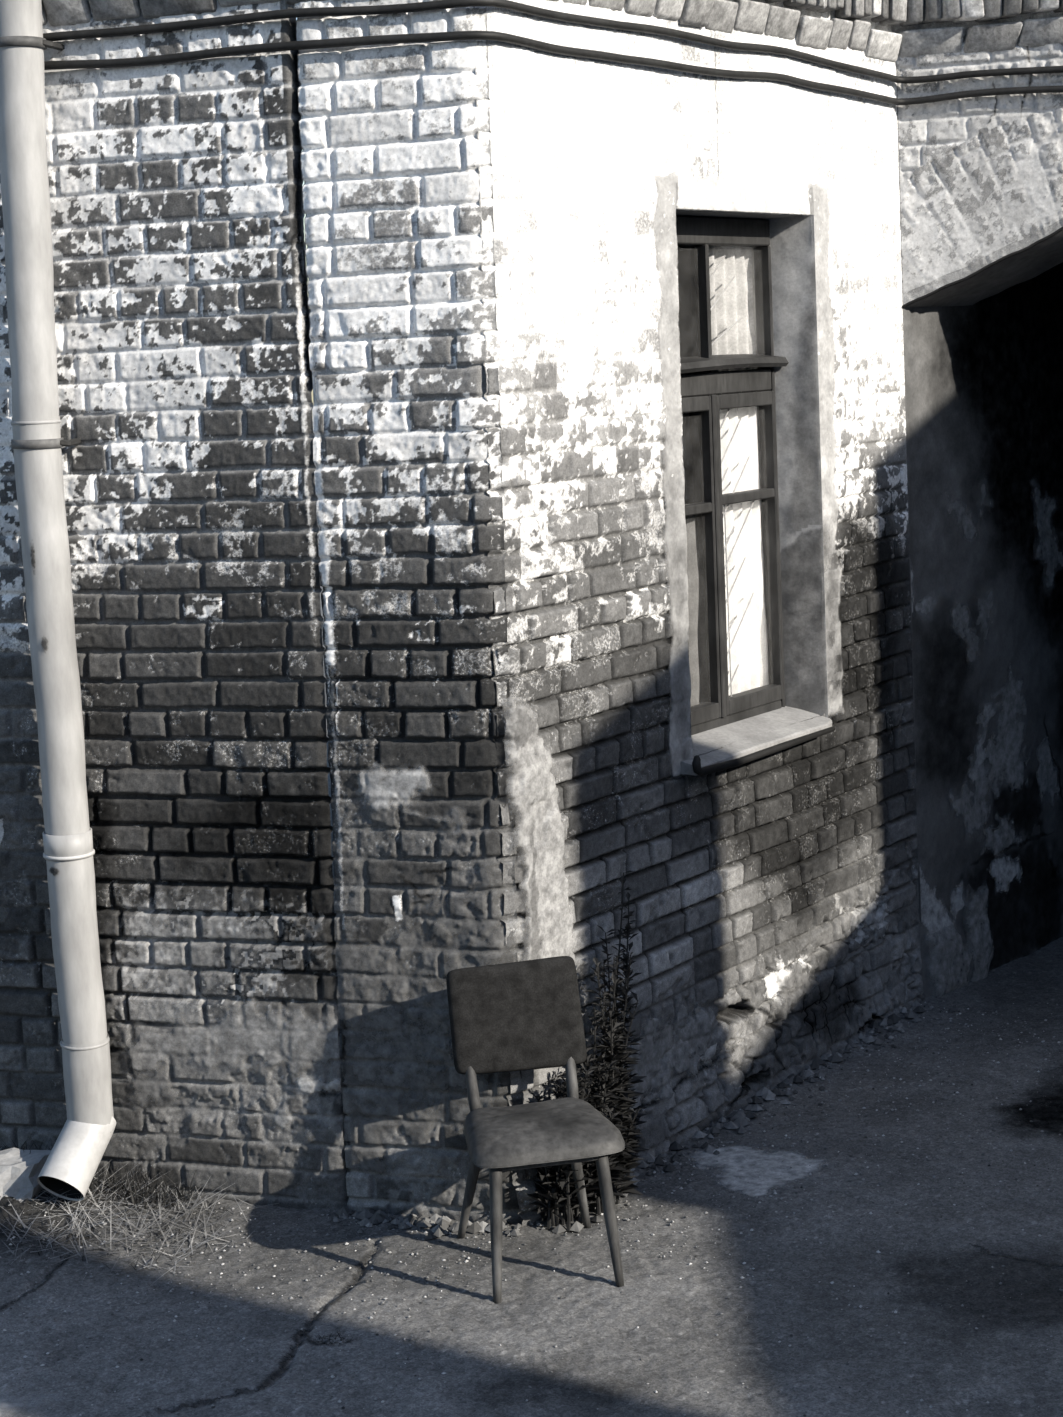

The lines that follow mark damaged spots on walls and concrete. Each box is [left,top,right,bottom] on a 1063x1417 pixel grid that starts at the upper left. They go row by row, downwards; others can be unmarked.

peeling [43,0,1063,743]
peeling [920,867,964,937]
peeling [949,665,1060,891]
leakage [969,774,1062,969]
crack [0,1253,72,1310]
crack [153,1250,373,1412]